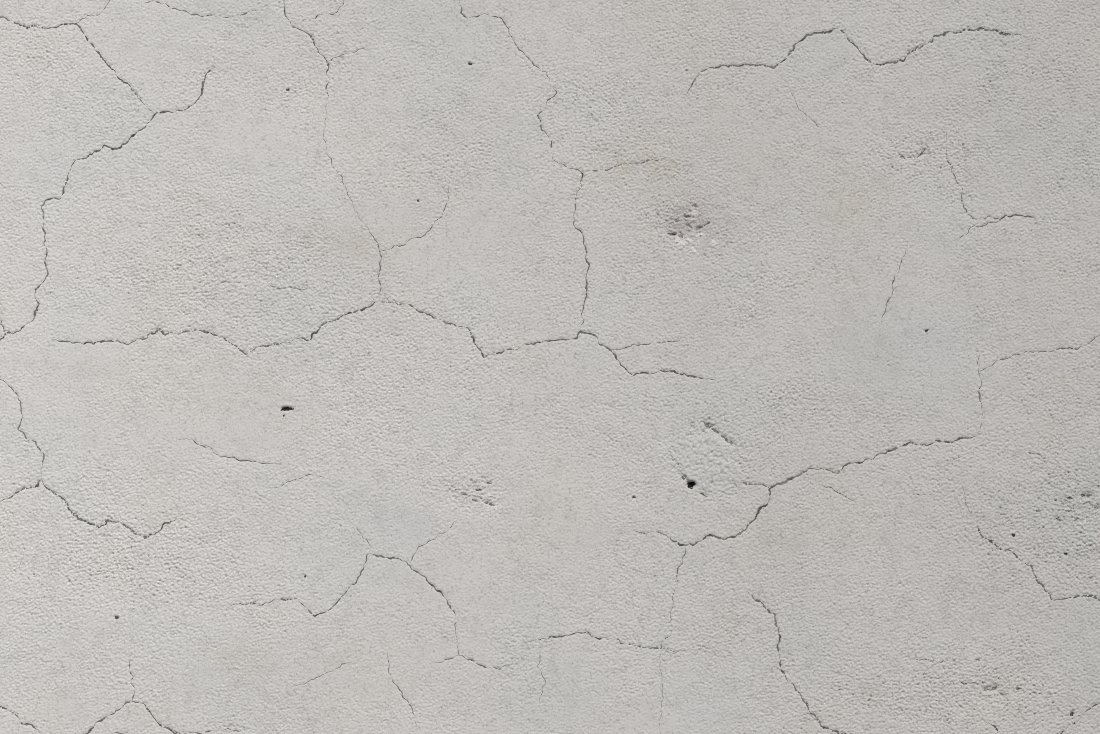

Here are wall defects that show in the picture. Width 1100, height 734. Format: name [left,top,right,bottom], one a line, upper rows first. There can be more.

crack [687,27,1023,93]
crack [0,0,214,340]
crack [57,1,713,380]
crack [946,132,1053,238]
crack [0,379,175,539]
crack [180,439,324,485]
crack [231,522,510,670]
crack [529,337,1100,734]
crack [86,640,245,734]